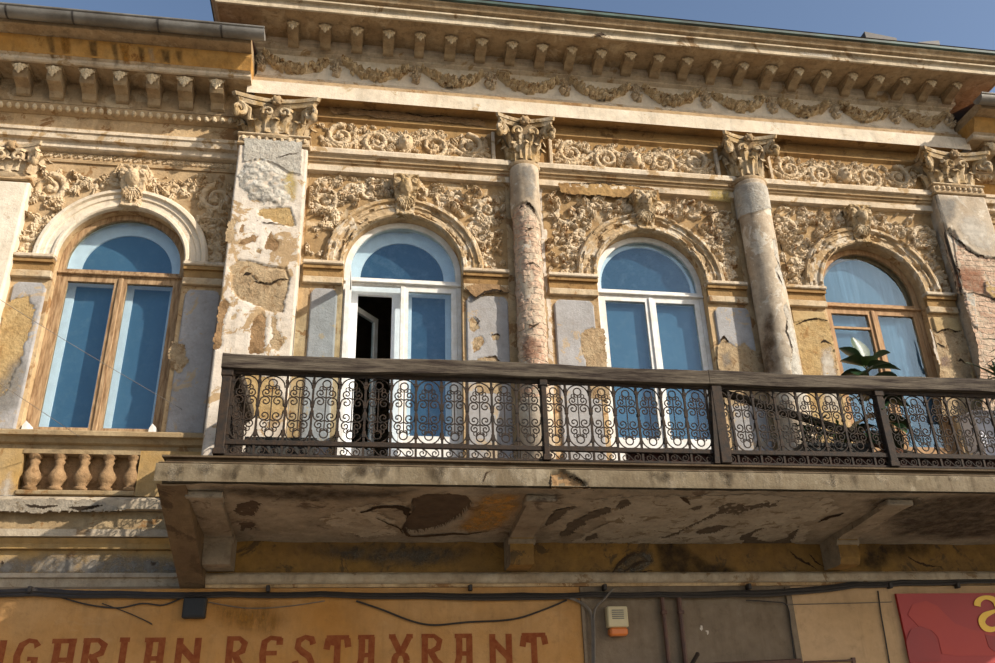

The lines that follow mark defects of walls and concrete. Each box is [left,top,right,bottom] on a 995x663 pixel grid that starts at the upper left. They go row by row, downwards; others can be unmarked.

spalling [558,182,660,201]
crack [947,228,995,259]
spalling [213,207,296,354]
flaking render [464,188,554,364]
flaking render [930,200,995,379]
spalling [0,296,36,410]
peeling [580,327,608,367]
peeling [476,382,502,394]
flaking render [519,384,554,401]
spalling [941,397,995,417]
spalling [0,498,125,513]
spalling [360,493,482,537]